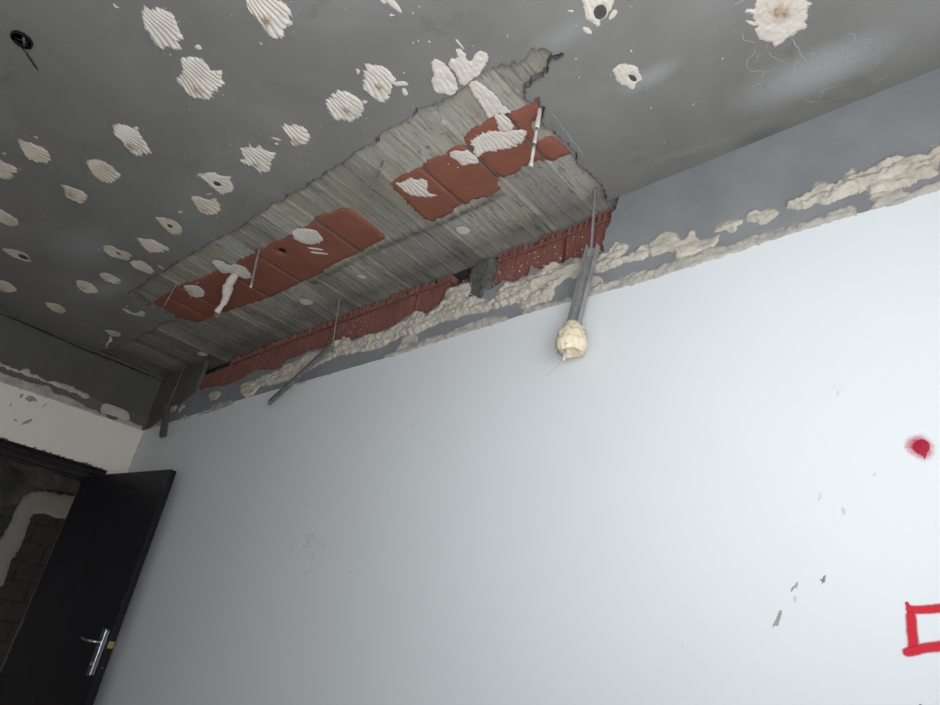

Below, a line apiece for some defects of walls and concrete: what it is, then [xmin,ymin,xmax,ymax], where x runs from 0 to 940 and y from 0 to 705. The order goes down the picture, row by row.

spalling [284,80,472,200]
spalling [483,47,608,198]
spalling [0,203,273,417]